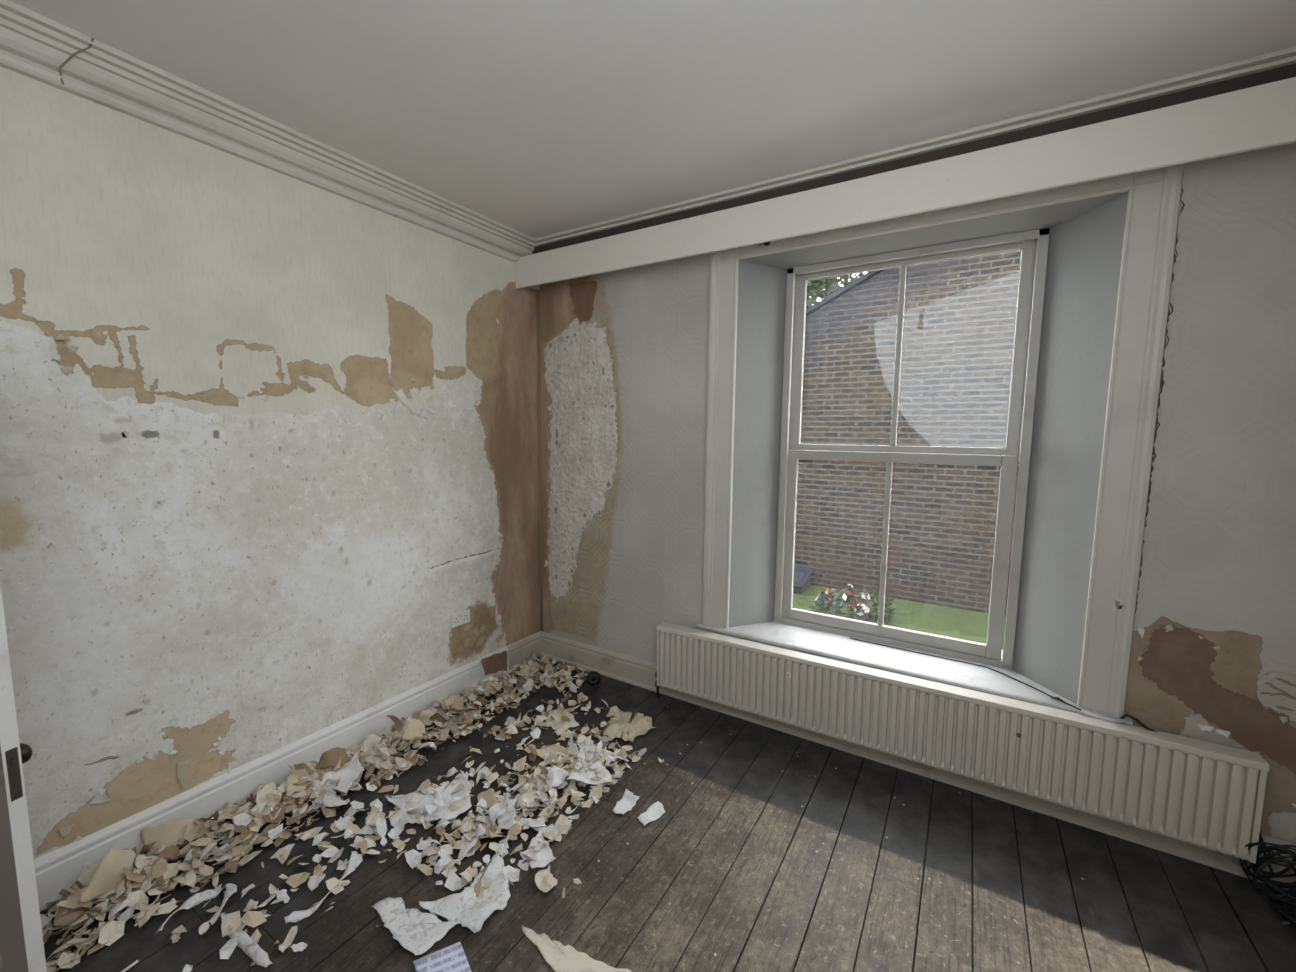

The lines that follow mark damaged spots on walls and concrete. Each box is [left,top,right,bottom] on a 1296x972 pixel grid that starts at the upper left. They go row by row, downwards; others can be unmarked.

peeling [0,268,502,447]
peeling [543,318,619,602]
crack [1135,174,1185,614]
flaking render [122,698,153,719]
peeling [1124,616,1296,743]
peeling [36,709,236,855]
peeling [1260,753,1296,835]